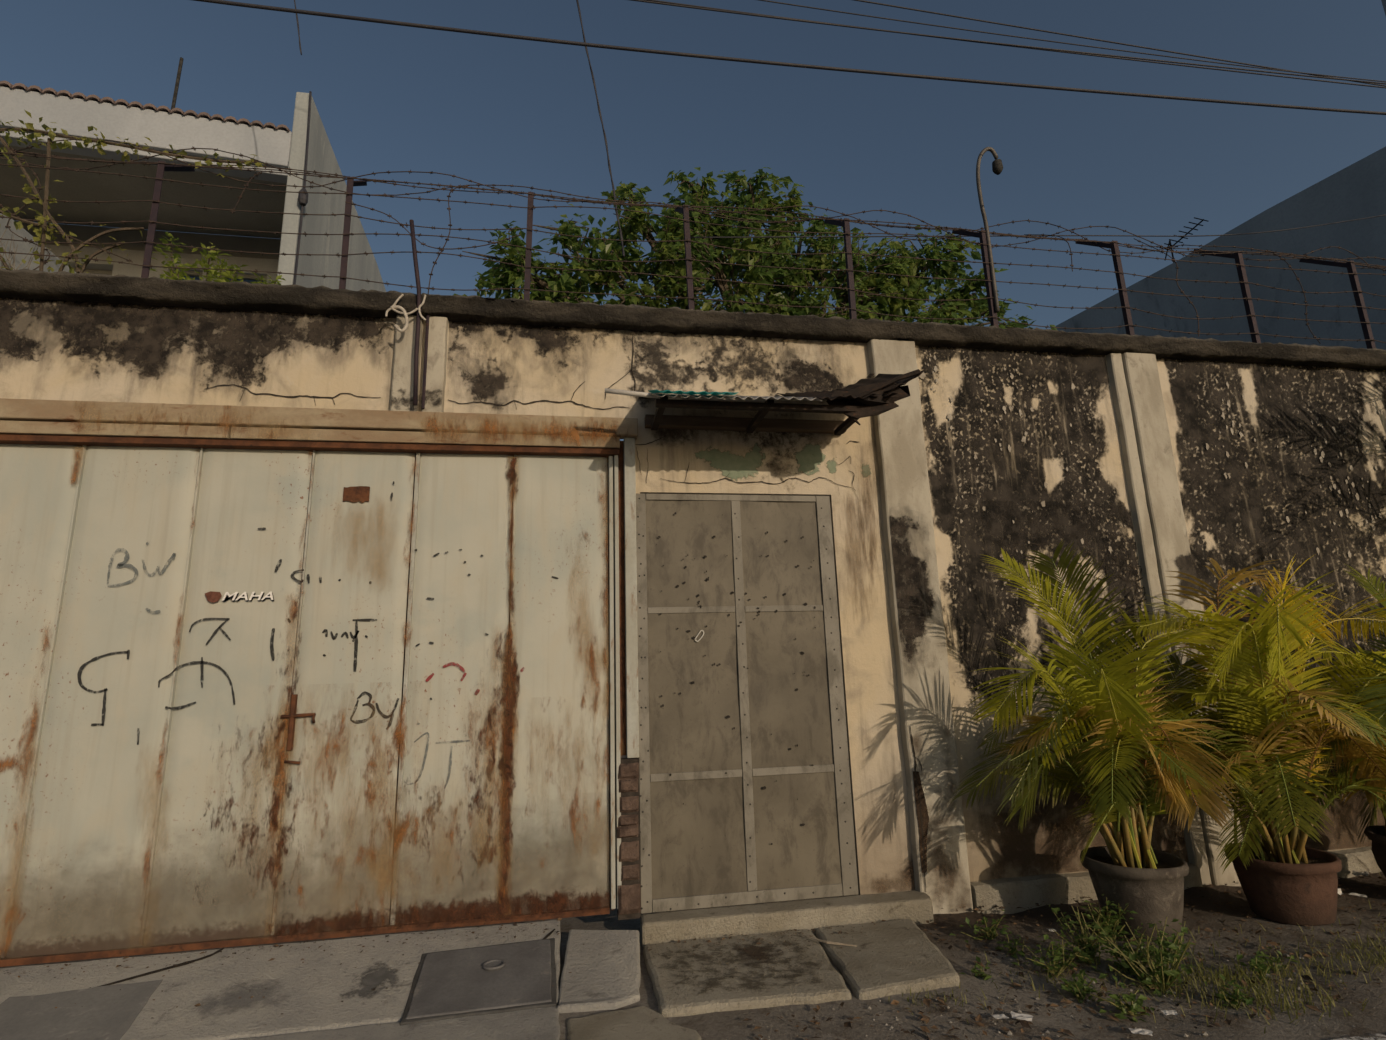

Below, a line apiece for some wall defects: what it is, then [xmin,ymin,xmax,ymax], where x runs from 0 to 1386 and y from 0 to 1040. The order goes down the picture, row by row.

water stain [0,297,387,388]
crack [206,384,381,405]
water stain [449,320,845,409]
rust [507,456,518,497]
peeling [695,443,766,481]
peeling [794,444,837,475]
water stain [889,345,1157,709]
water stain [1156,358,1386,704]
rust [523,423,626,772]
rust [0,706,37,770]
rust [204,649,301,896]
rust [269,572,609,938]